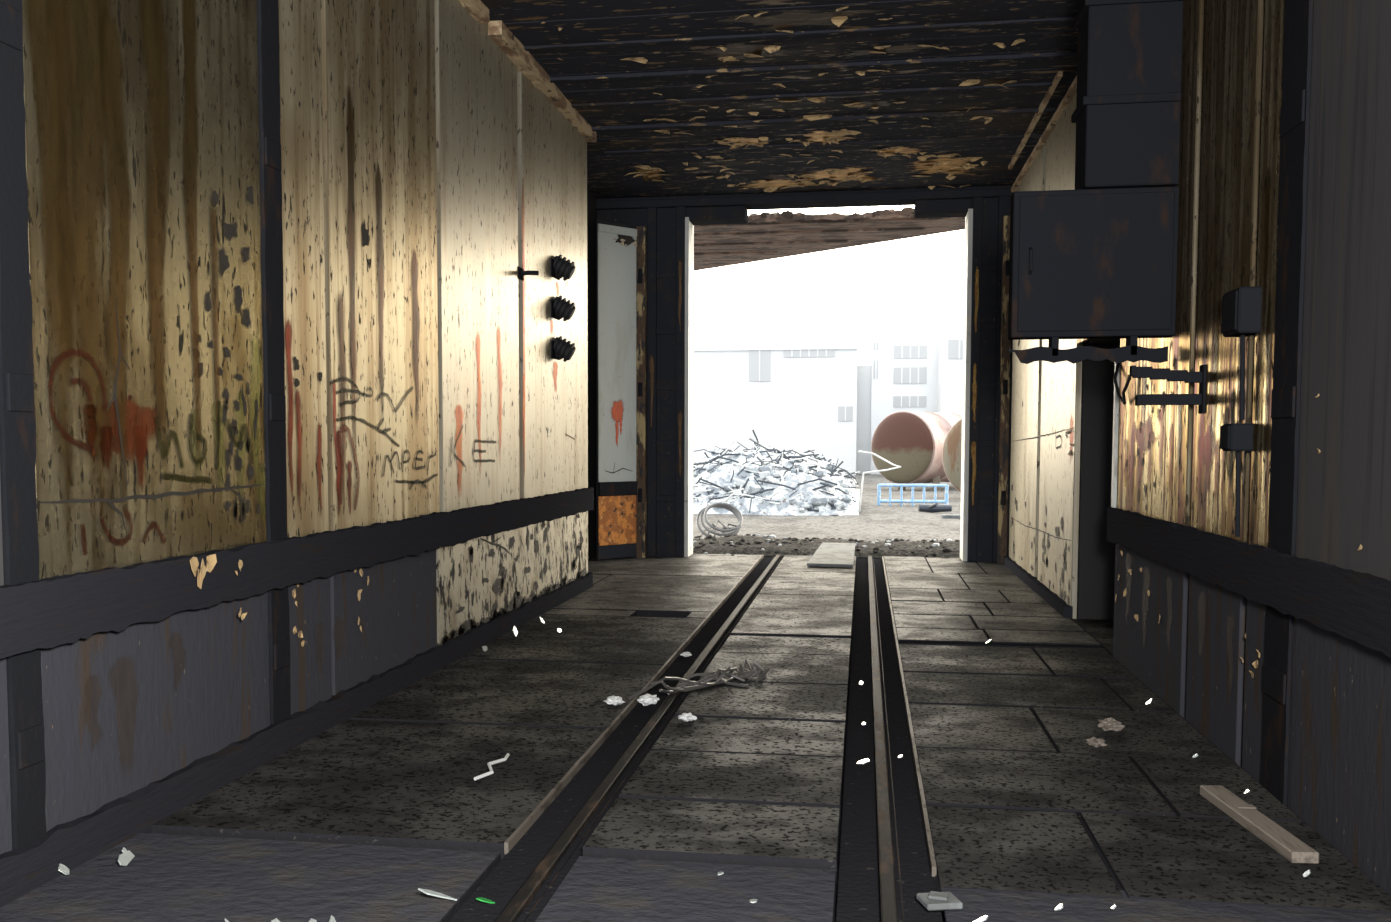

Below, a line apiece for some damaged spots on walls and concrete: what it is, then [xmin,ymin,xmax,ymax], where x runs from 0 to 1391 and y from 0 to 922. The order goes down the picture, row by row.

peeling [625,165,667,182]
peeling [676,5,897,88]
peeling [643,83,988,192]
peeling [842,43,950,76]
peeling [942,78,1017,124]
leakage [29,0,220,515]
spalling [440,513,587,646]